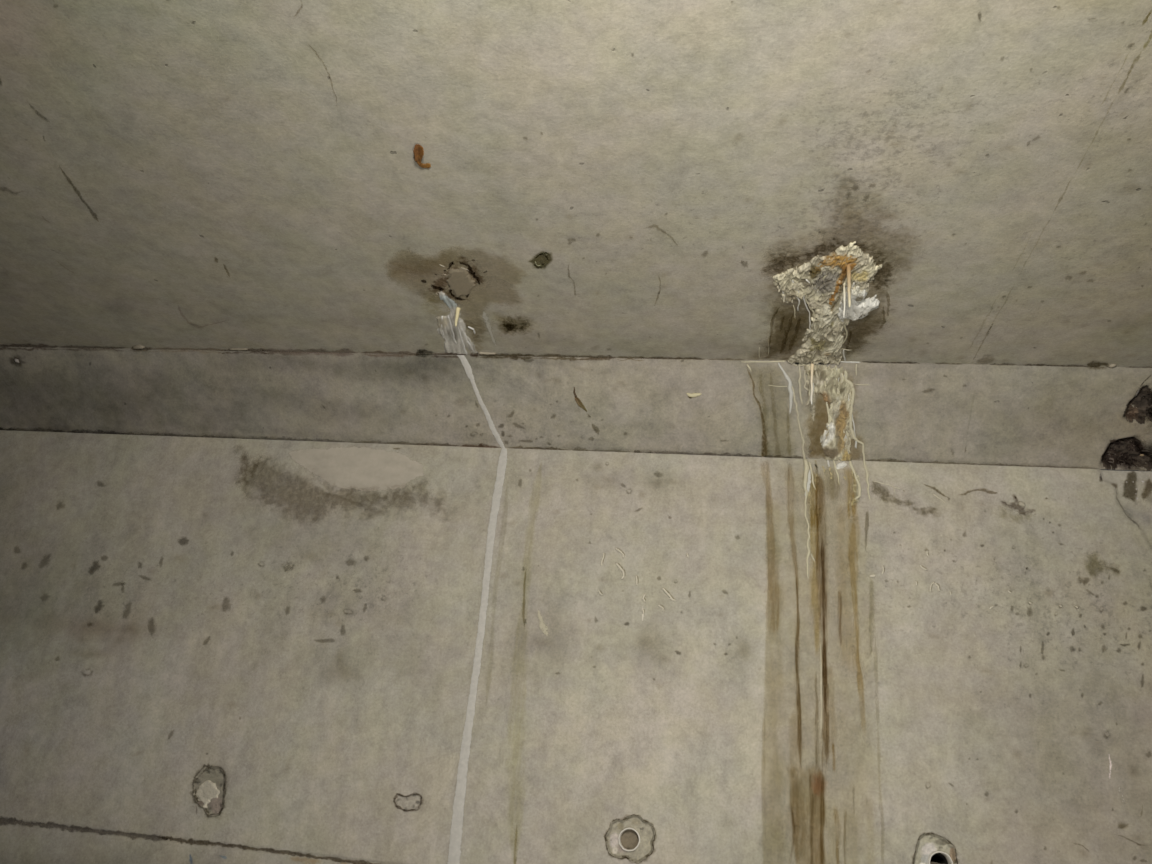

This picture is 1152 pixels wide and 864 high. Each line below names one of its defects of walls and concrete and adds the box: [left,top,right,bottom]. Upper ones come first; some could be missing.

leakage [745,241,883,579]